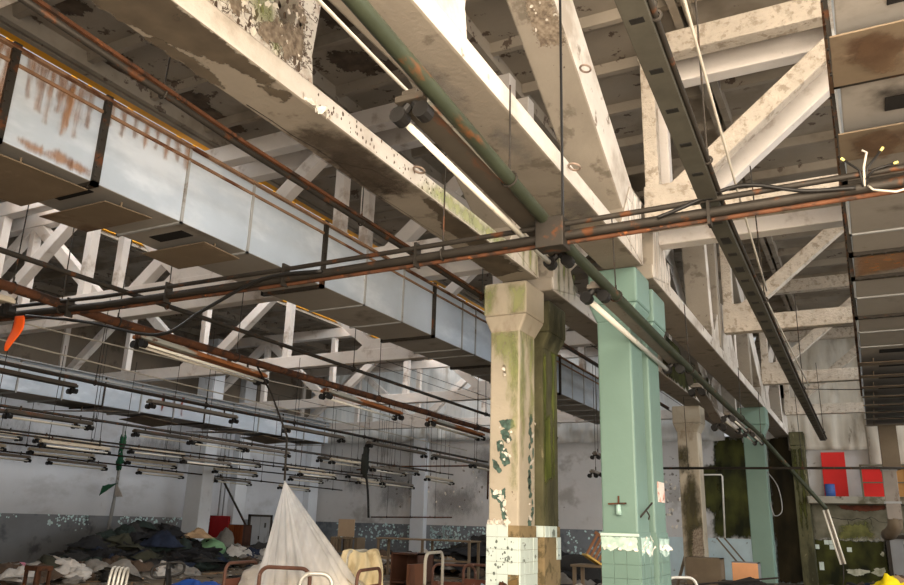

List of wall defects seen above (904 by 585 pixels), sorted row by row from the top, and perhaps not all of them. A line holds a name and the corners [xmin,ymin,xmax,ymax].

peeling [214,0,308,72]
corrosion [32,63,92,131]
corrosion [22,140,86,172]
leakage [423,198,489,246]
leakage [471,250,537,277]
peeling [492,419,515,473]
peeling [527,414,536,526]
peeling [47,514,89,531]
peeling [355,523,410,548]
peeling [429,461,511,550]
spalling [567,530,673,558]
spalling [692,527,705,557]